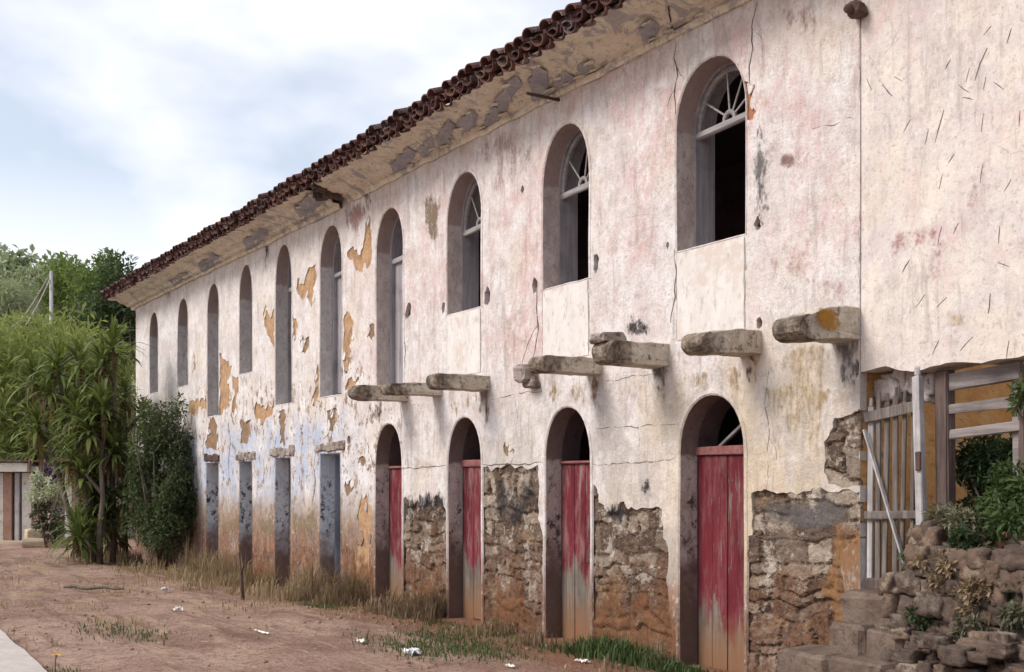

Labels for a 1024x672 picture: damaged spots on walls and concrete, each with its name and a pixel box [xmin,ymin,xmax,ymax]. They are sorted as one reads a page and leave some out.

crack [650,7,683,116]
crack [748,2,762,84]
flaking render [388,58,607,177]
damp [754,129,768,225]
flaking render [348,216,372,276]
crack [669,249,677,341]
flaking render [189,354,287,450]
flaking render [342,311,375,390]
flaking render [403,497,447,617]
flaking render [483,441,543,637]
flaking render [593,485,672,661]
flaking render [747,410,864,672]